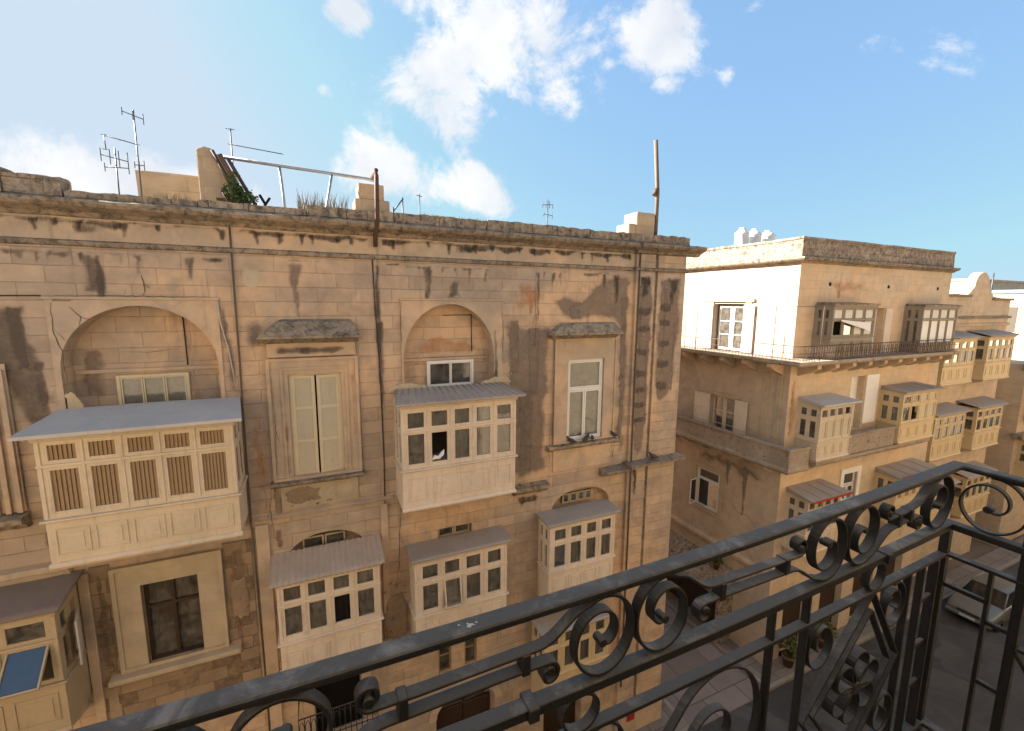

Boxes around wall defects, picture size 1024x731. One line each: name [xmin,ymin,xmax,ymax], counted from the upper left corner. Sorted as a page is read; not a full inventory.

water stain [0,308,49,424]
water stain [85,256,104,296]
water stain [75,220,135,231]
crack [50,275,205,382]
water stain [290,266,300,291]
water stain [296,234,366,244]
water stain [508,321,548,476]
water stain [558,274,679,453]